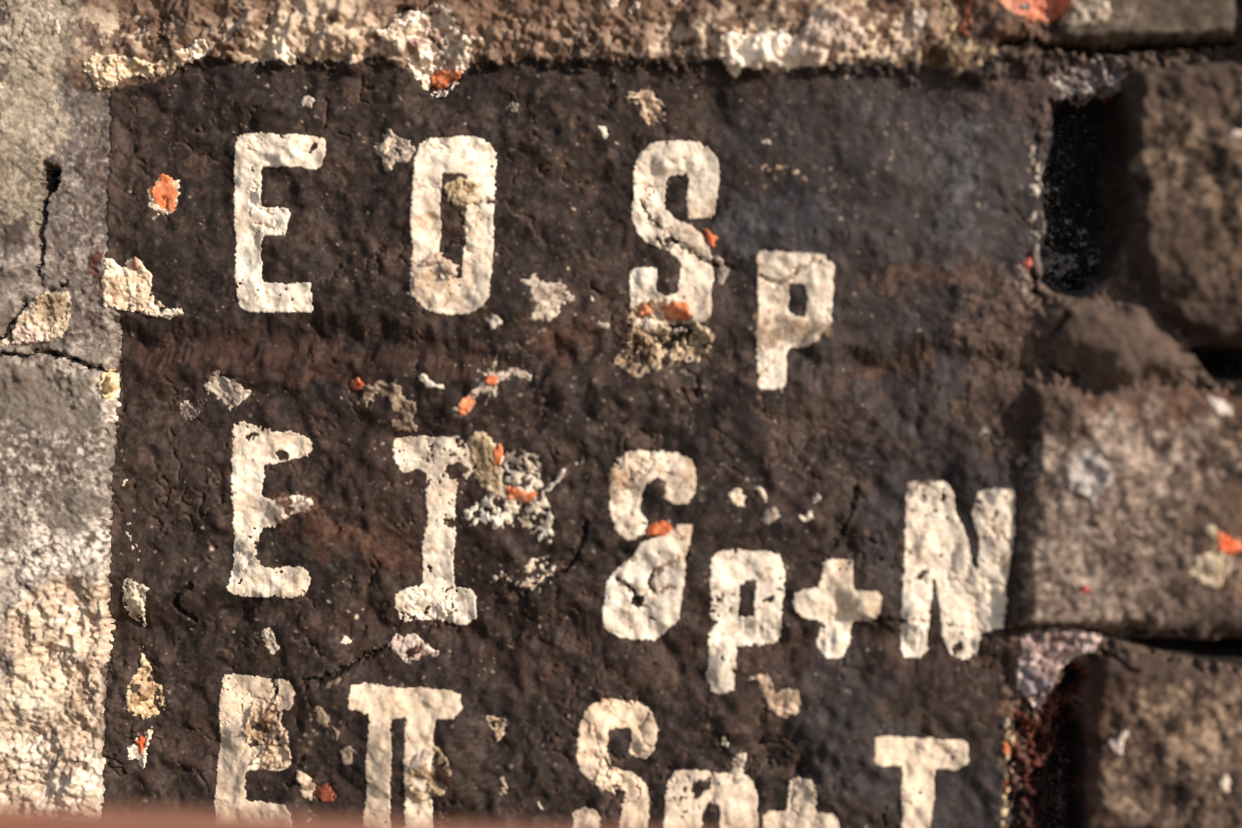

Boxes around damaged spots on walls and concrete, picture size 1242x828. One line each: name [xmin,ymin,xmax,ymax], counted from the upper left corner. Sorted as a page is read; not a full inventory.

spalling [376,2,483,98]
flaking render [997,0,1073,25]
crack [0,219,109,371]
spalling [101,257,183,319]
peeling [488,315,502,331]
spalling [521,273,575,344]
spalling [613,298,716,378]
peeling [464,431,584,593]
spalling [125,646,165,769]
peeling [1020,660,1088,702]
rust [1019,694,1067,828]